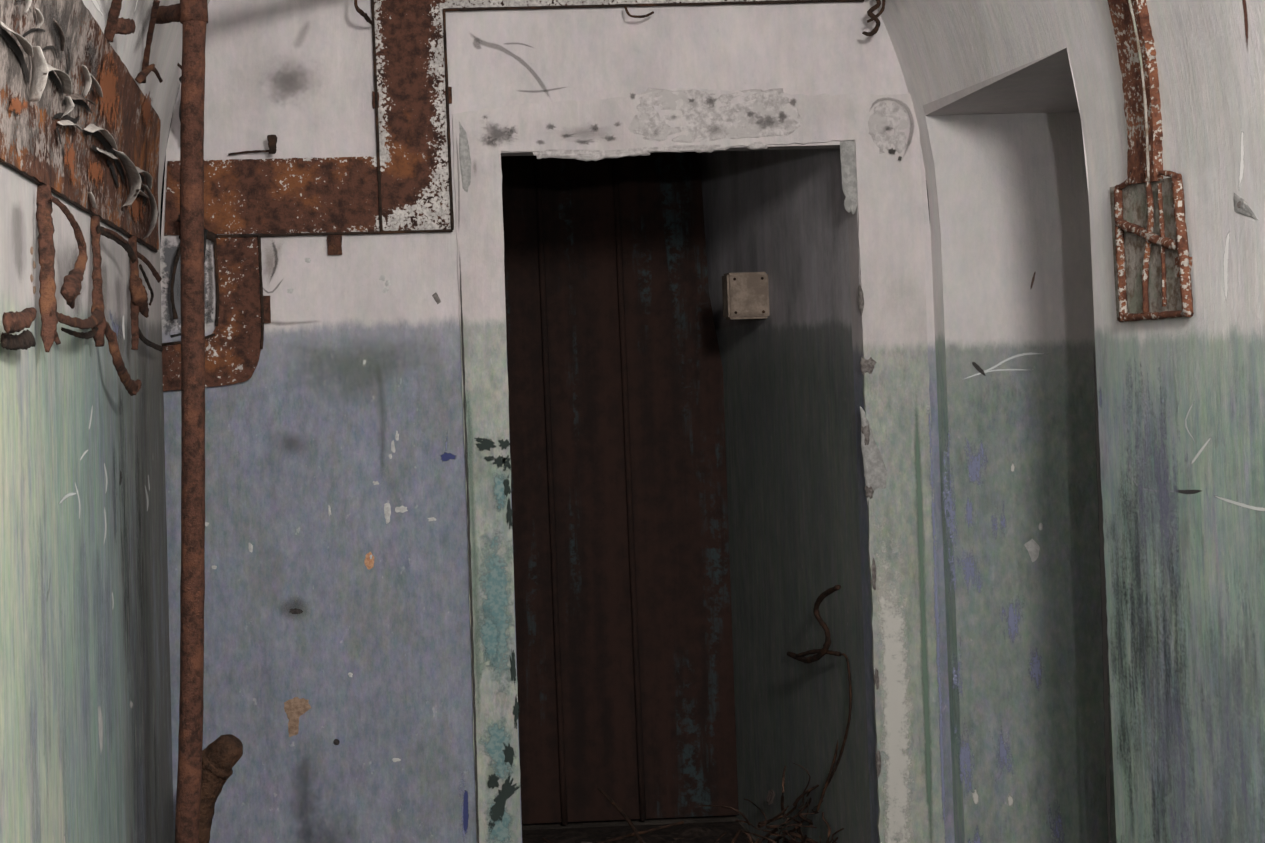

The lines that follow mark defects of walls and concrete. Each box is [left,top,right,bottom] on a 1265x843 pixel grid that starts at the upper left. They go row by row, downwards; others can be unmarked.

corrosion [96,52,120,136]
flaking render [533,88,803,161]
corrosion [64,140,103,189]
peeling [468,409,511,690]
peeling [481,723,513,779]
peeling [487,802,512,843]